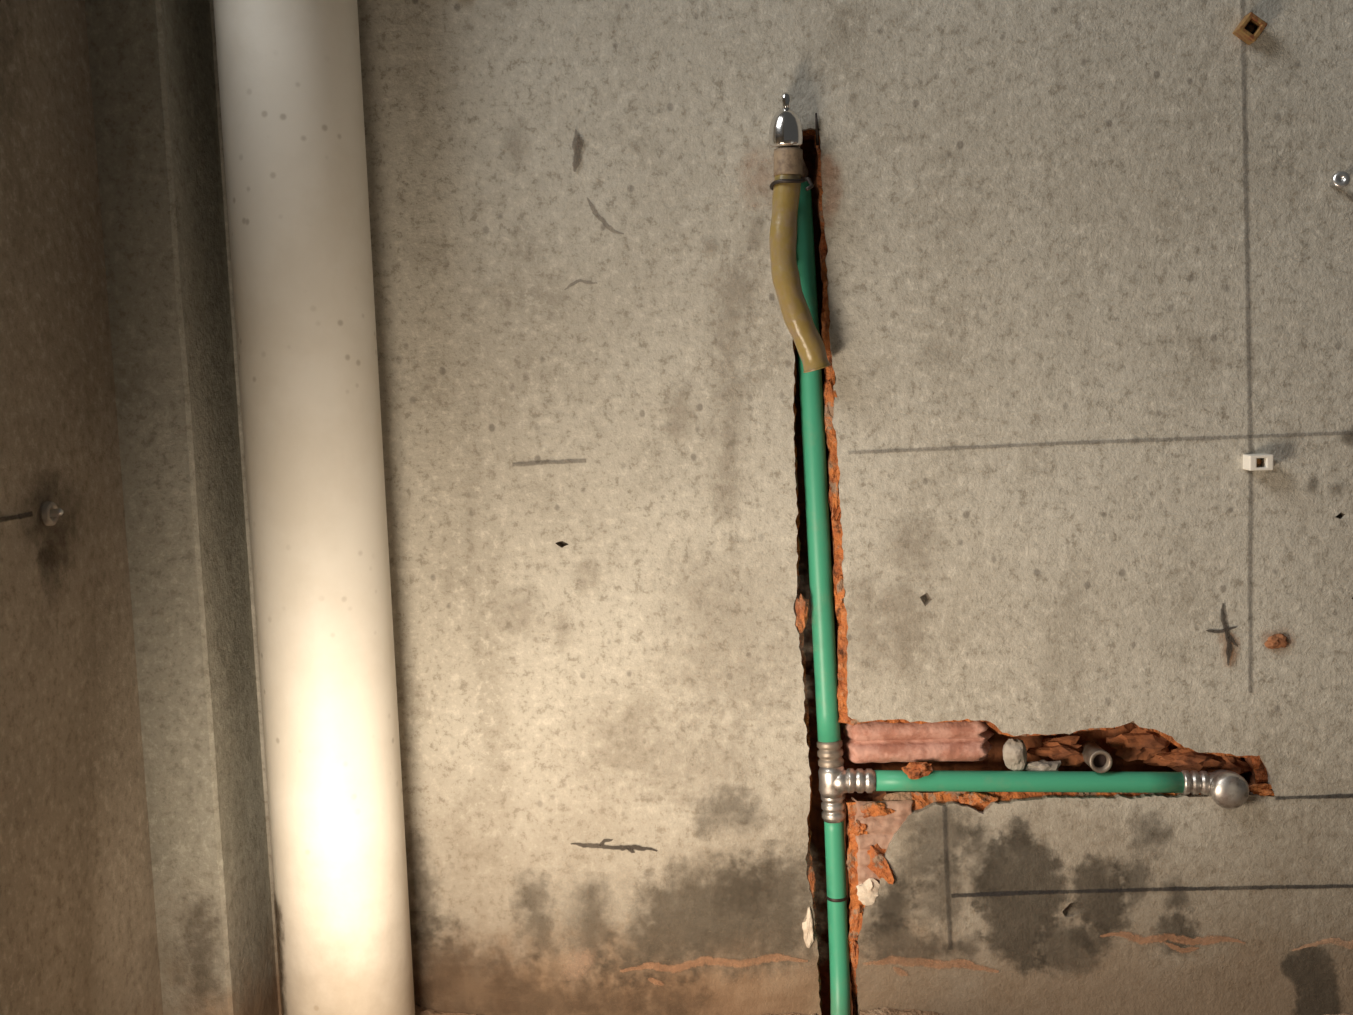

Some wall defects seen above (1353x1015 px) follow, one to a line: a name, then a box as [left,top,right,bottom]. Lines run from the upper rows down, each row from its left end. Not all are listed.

spalling [803,130,1056,737]
spalling [793,340,810,758]
spalling [1073,721,1274,796]
spalling [806,775,822,1010]
spalling [846,762,1200,1015]
damp [975,832,1124,971]
crack [1100,932,1246,953]
damp [1161,915,1194,950]
damp [1282,948,1339,1015]
crack [1292,938,1353,951]